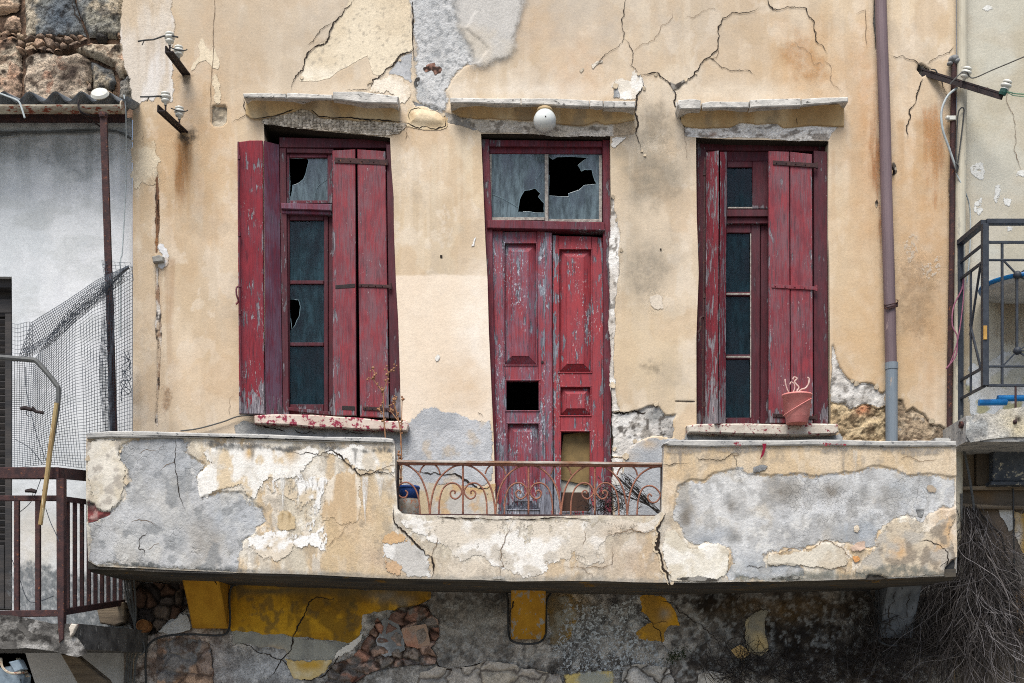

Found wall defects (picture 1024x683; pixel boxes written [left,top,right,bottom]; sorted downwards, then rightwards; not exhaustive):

crack [233,0,446,137]
peeling [300,0,479,130]
crack [593,1,839,160]
crack [894,49,952,139]
flaking render [608,195,676,485]
flaking render [830,346,885,409]
peeling [85,438,129,523]
peeling [197,442,395,561]
crack [253,424,721,647]
peeling [400,482,729,582]
peeling [766,510,956,580]
crack [241,597,339,681]